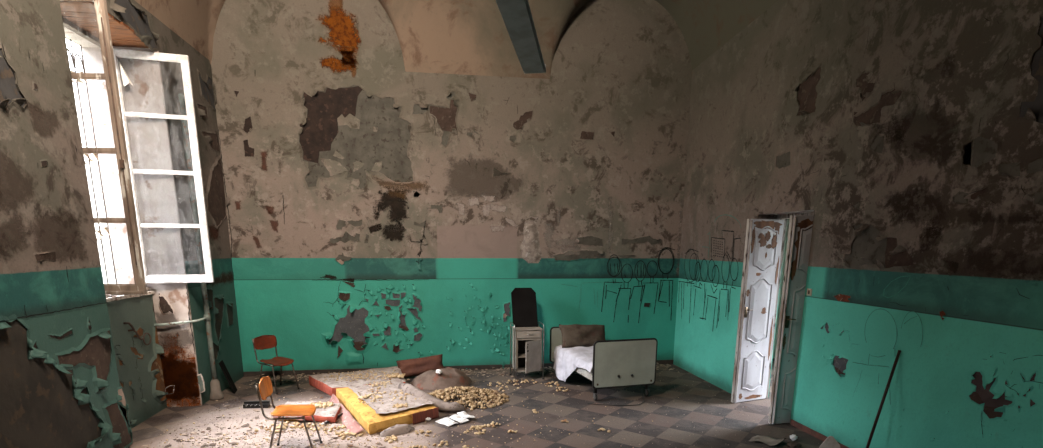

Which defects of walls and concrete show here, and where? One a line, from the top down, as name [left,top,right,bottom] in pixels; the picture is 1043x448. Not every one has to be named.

peeling [296,82,480,228]
peeling [321,280,424,360]
peeling [832,354,850,379]
peeling [968,354,1038,420]